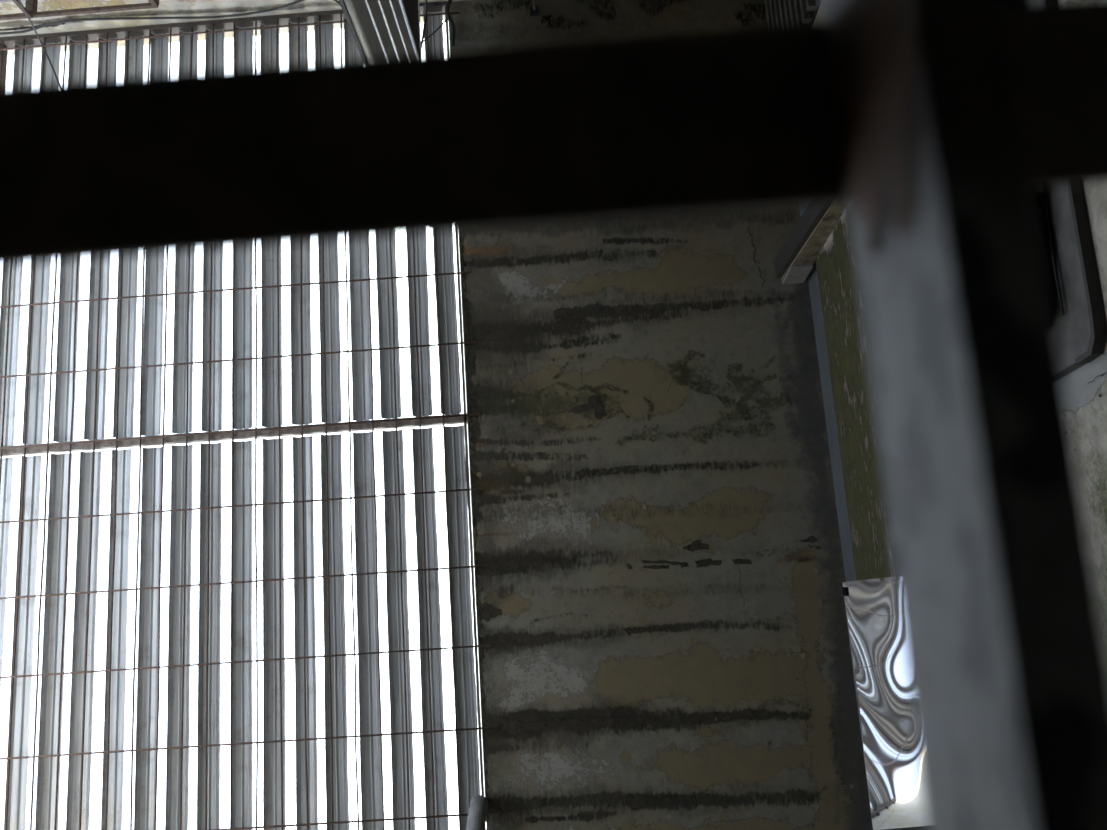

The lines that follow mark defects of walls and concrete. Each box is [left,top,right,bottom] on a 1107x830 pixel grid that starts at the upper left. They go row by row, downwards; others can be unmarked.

peeling [504,354,690,435]
peeling [493,488,605,550]
damp [459,234,873,830]
spalling [627,540,752,569]
peeling [490,644,602,717]
peeling [501,741,616,796]